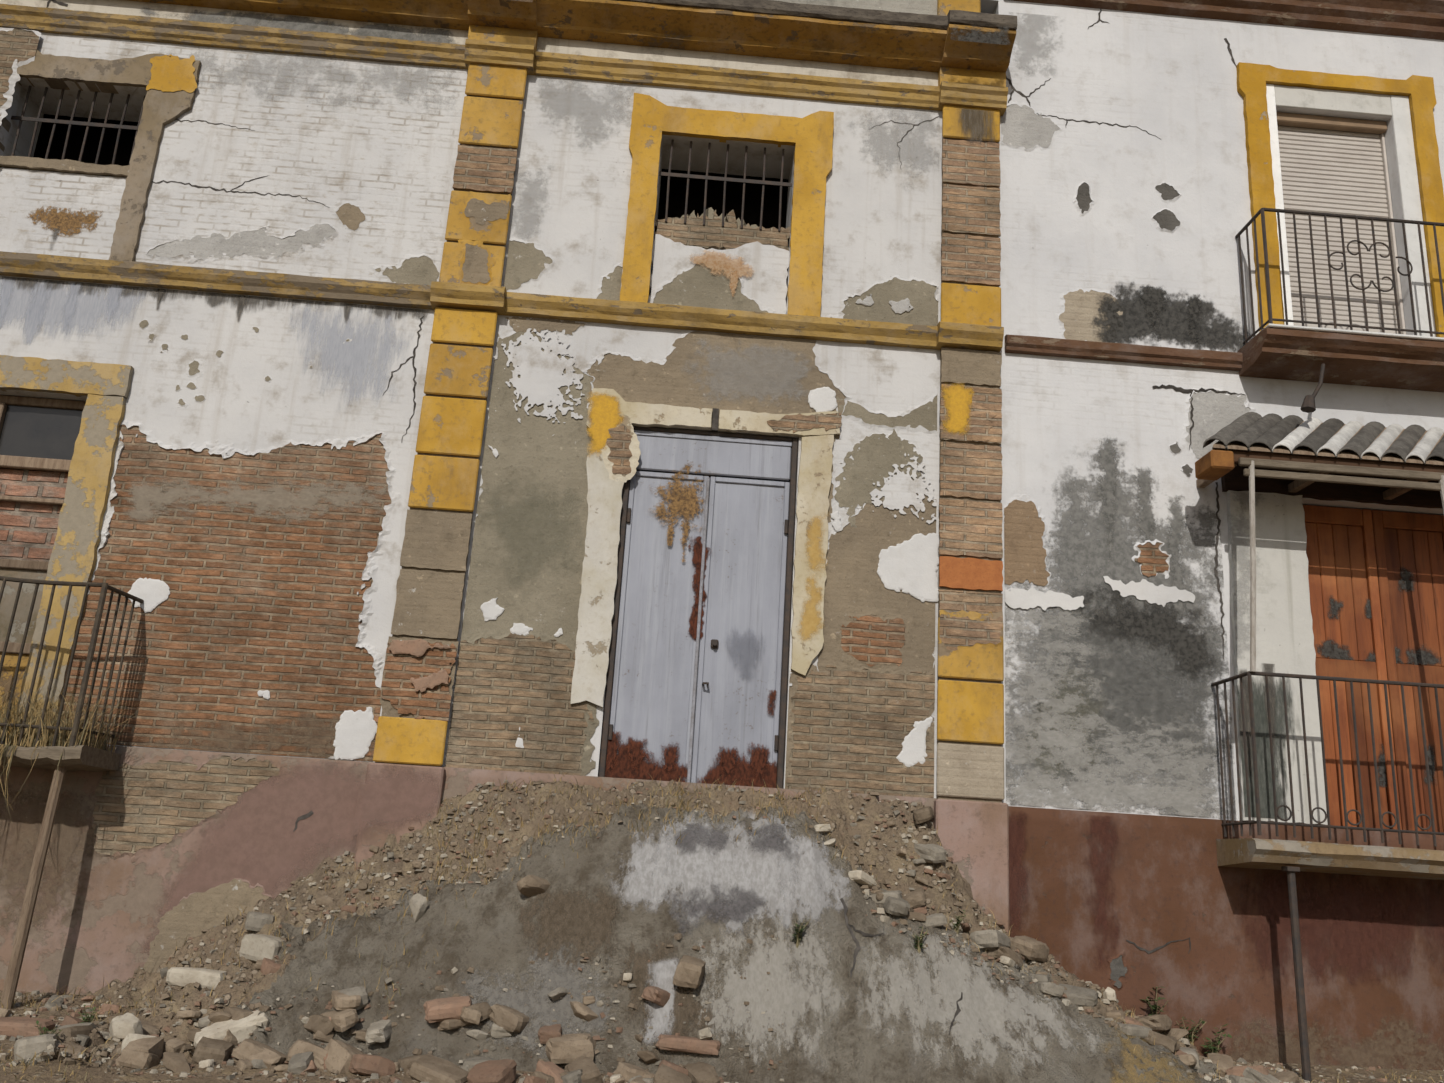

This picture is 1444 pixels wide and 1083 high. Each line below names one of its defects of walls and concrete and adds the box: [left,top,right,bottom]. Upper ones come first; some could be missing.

flaking render [0,27,41,125]
crack [174,119,255,131]
crack [1006,76,1160,139]
rust [28,206,102,239]
crack [152,176,330,208]
flaking render [1072,181,1095,216]
flaking render [1151,181,1182,234]
mould [1093,282,1251,352]
rust [654,465,710,640]
flaking render [58,317,1003,863]
damp [1005,439,1294,963]
rust [605,732,777,788]